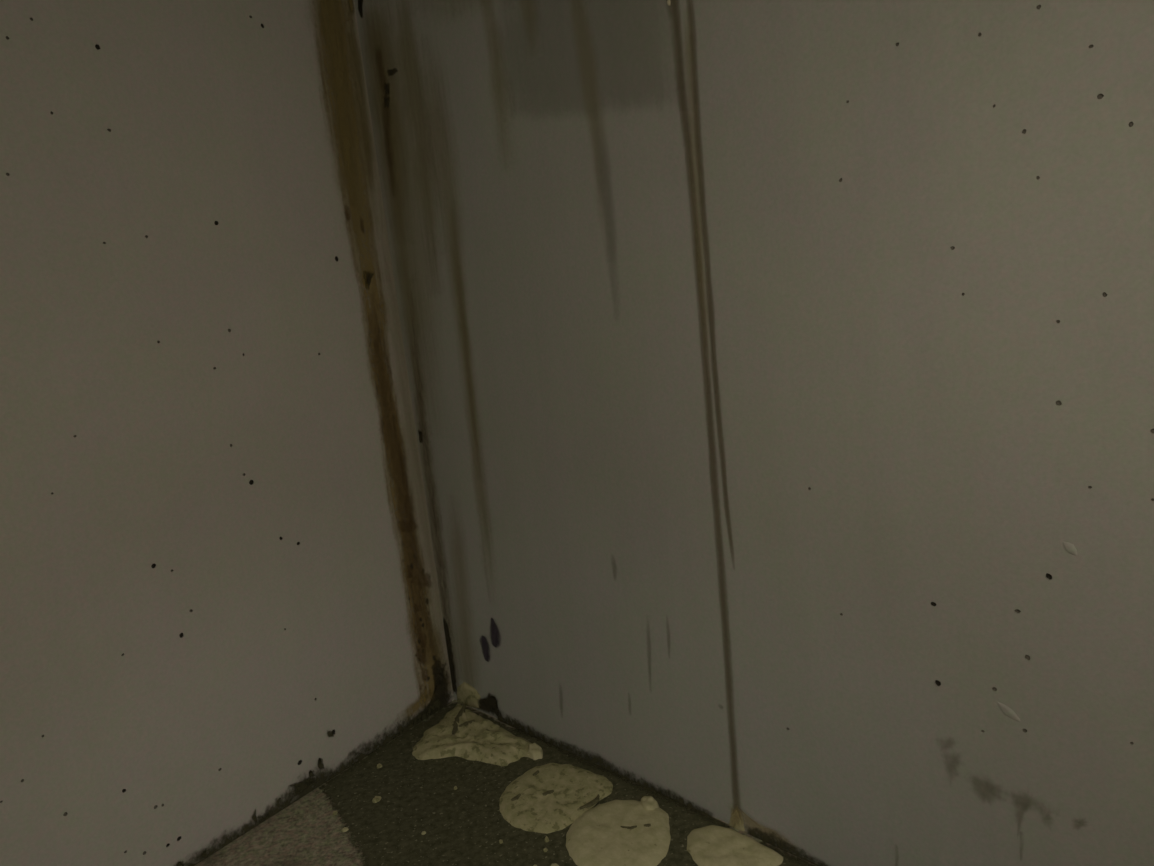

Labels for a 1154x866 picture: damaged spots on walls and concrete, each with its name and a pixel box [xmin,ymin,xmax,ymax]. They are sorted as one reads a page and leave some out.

corrosion [318,0,457,702]
damp [177,0,827,866]